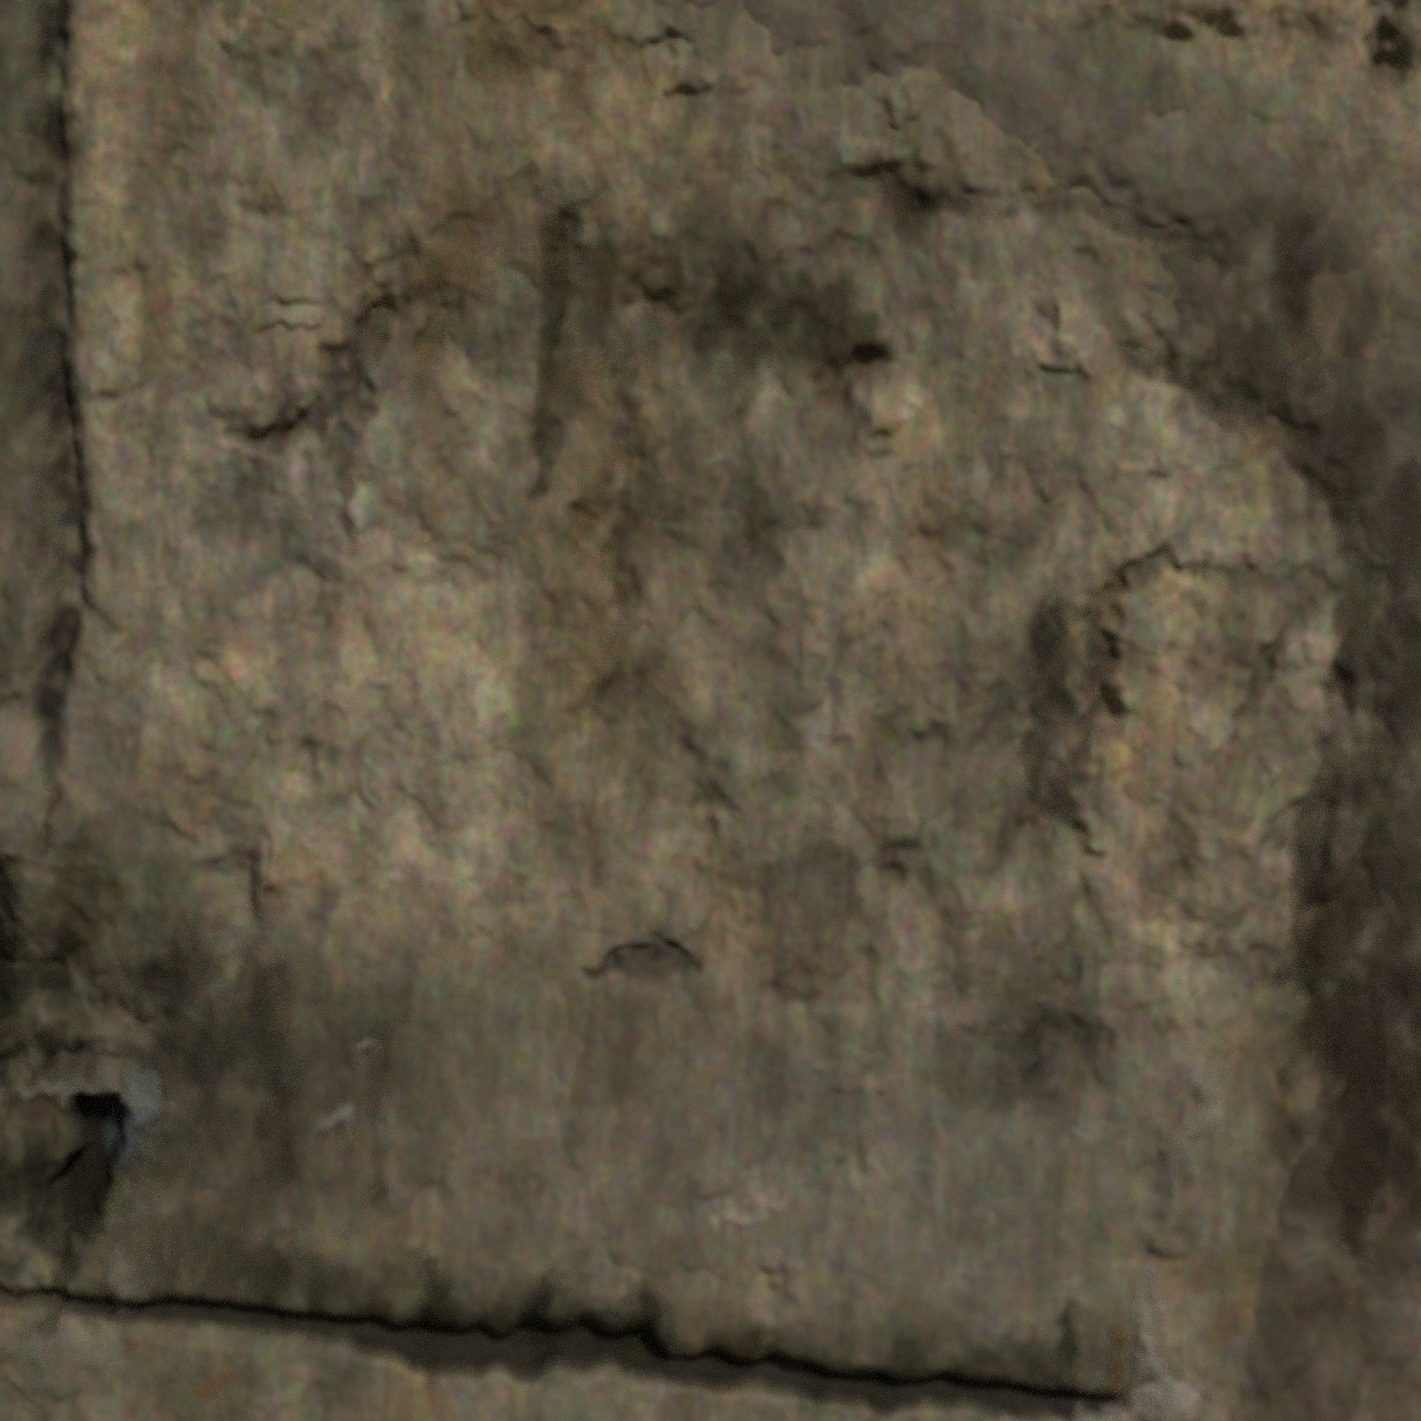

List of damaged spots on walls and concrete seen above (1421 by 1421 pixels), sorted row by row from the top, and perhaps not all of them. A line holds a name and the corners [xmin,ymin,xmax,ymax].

crack [44,106,65,160]
crack [36,222,85,573]
crack [42,608,77,739]
crack [62,1296,1119,1420]